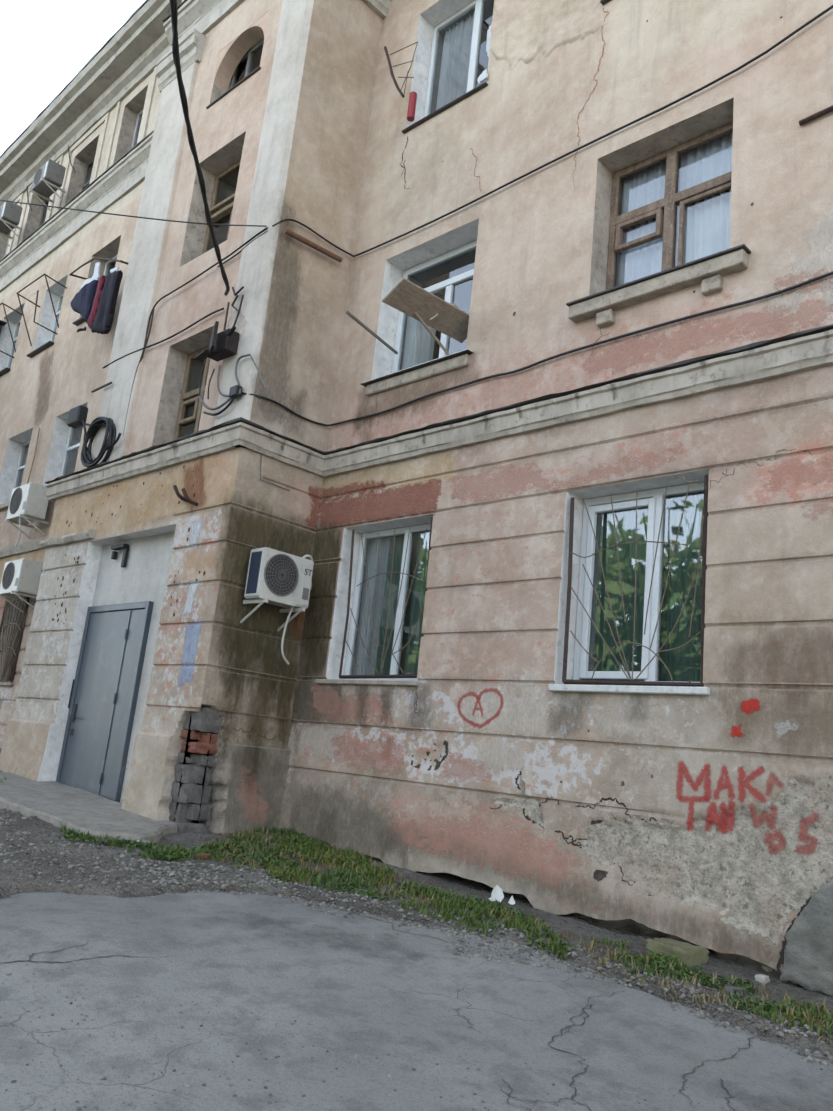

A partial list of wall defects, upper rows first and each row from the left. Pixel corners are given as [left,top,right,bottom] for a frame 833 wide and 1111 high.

crack [572,7,609,191]
peeling [306,479,441,531]
water stain [220,505,340,787]
spalling [411,741,449,771]
crack [489,771,675,848]
spalling [581,774,833,949]